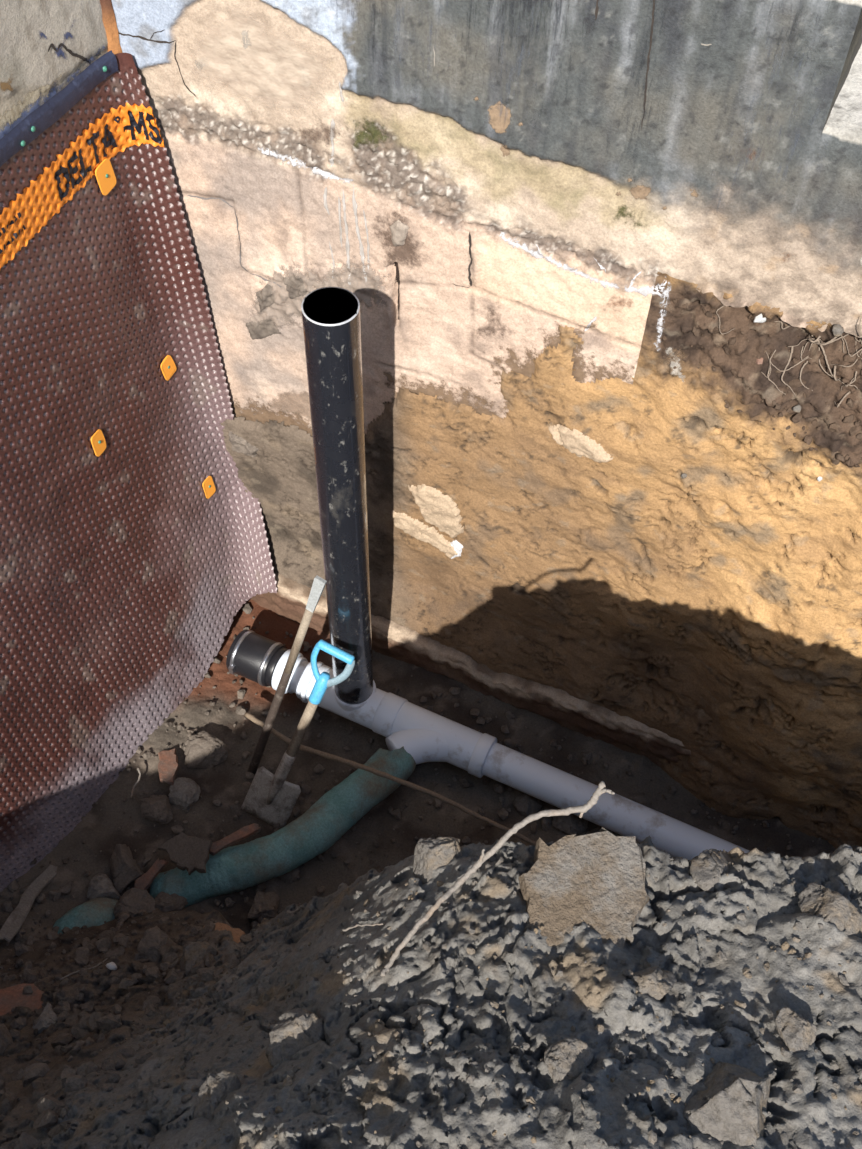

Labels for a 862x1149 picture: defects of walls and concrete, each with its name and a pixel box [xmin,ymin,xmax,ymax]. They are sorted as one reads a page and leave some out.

crack [118,30,196,97]
crack [641,0,655,129]
spalling [474,97,523,156]
spalling [616,178,651,199]
crack [452,232,472,288]
flaking render [246,259,389,340]